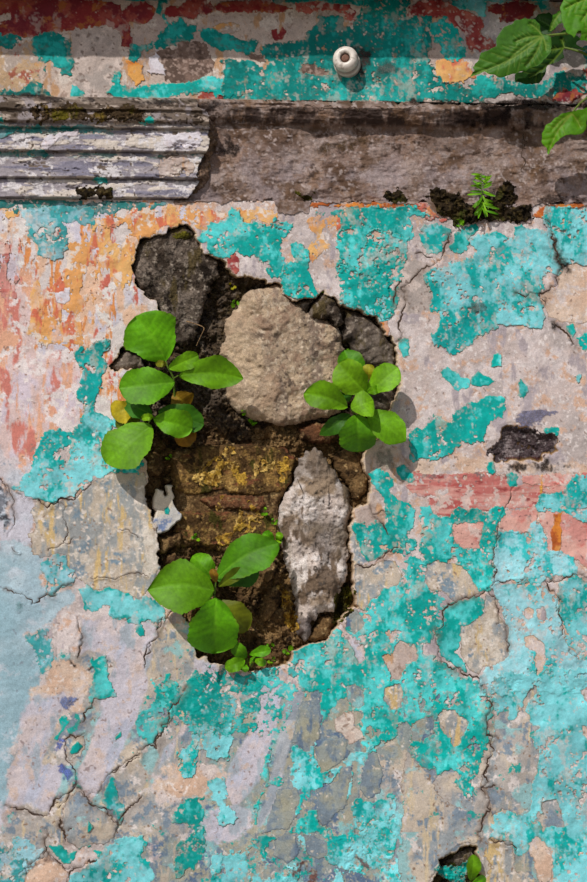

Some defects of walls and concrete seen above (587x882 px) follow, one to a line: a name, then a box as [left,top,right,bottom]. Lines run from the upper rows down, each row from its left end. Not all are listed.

peeling [0,0,587,105]
peeling [0,114,114,158]
peeling [138,116,203,178]
crack [393,235,450,333]
crack [518,221,563,303]
peeling [0,199,587,882]
crack [143,611,172,667]
crack [435,496,583,851]
crack [8,695,182,877]